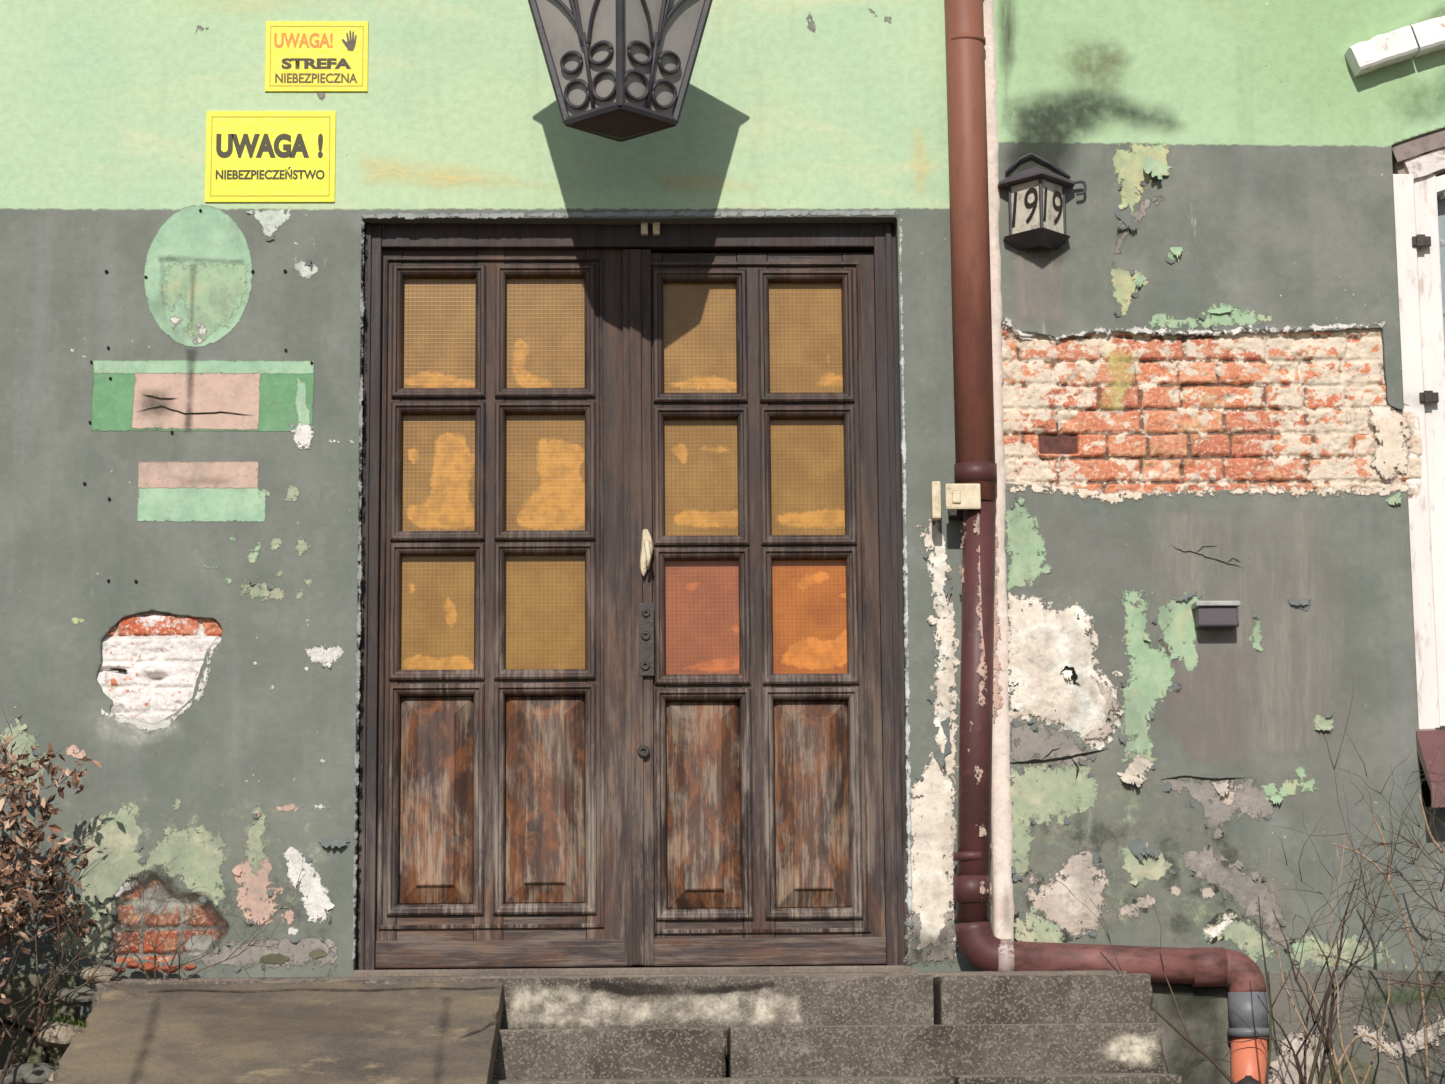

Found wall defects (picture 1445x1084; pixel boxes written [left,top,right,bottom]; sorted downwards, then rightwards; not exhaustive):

crack [137,394,247,415]
flaking render [903,141,1422,971]
flaking render [97,611,223,732]
peeling [0,705,86,792]
peeling [46,797,350,972]
water stain [512,980,799,1025]